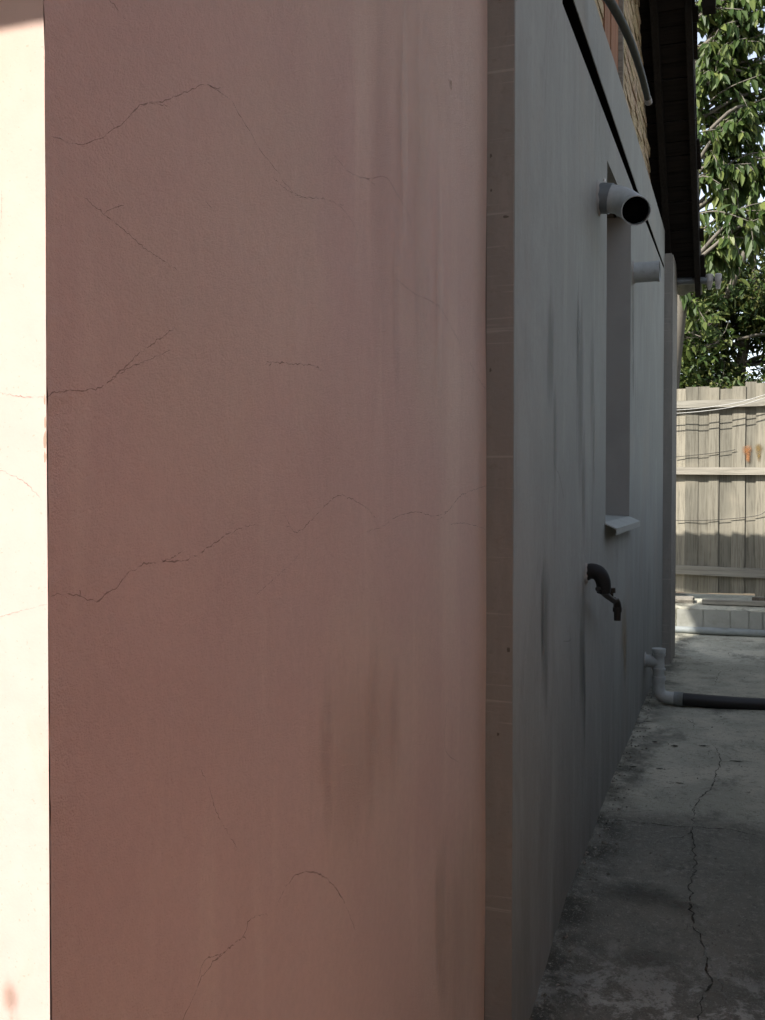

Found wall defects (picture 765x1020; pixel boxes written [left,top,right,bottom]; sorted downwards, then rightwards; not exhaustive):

crack [605,747,754,1020]